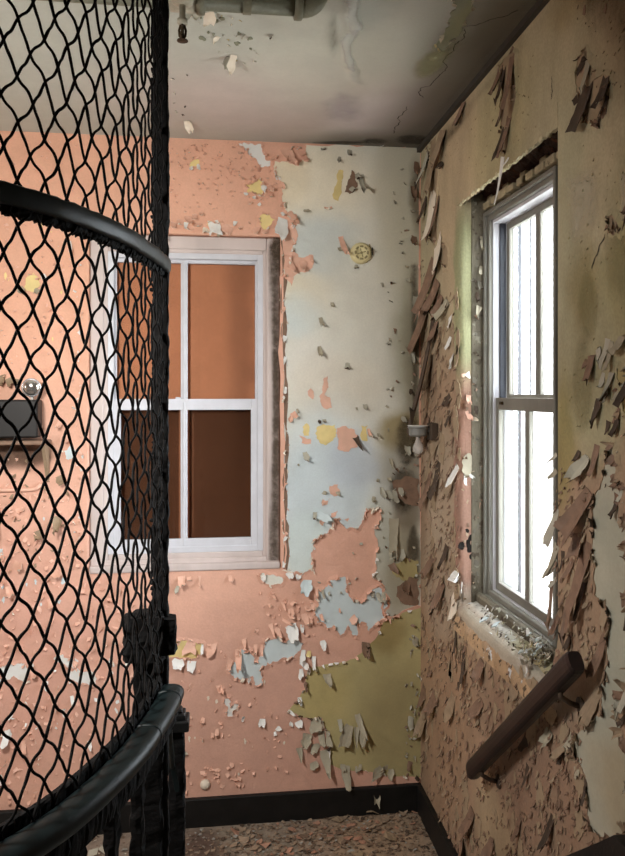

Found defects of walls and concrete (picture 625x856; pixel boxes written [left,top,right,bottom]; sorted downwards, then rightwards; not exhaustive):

peeling [173,91,194,134]
peeling [186,11,258,75]
peeling [432,0,476,52]
crack [393,10,518,134]
spalling [456,0,625,211]
peeling [1,216,83,355]
peeling [0,355,54,387]
peeling [169,101,625,856]
peeling [0,419,133,806]